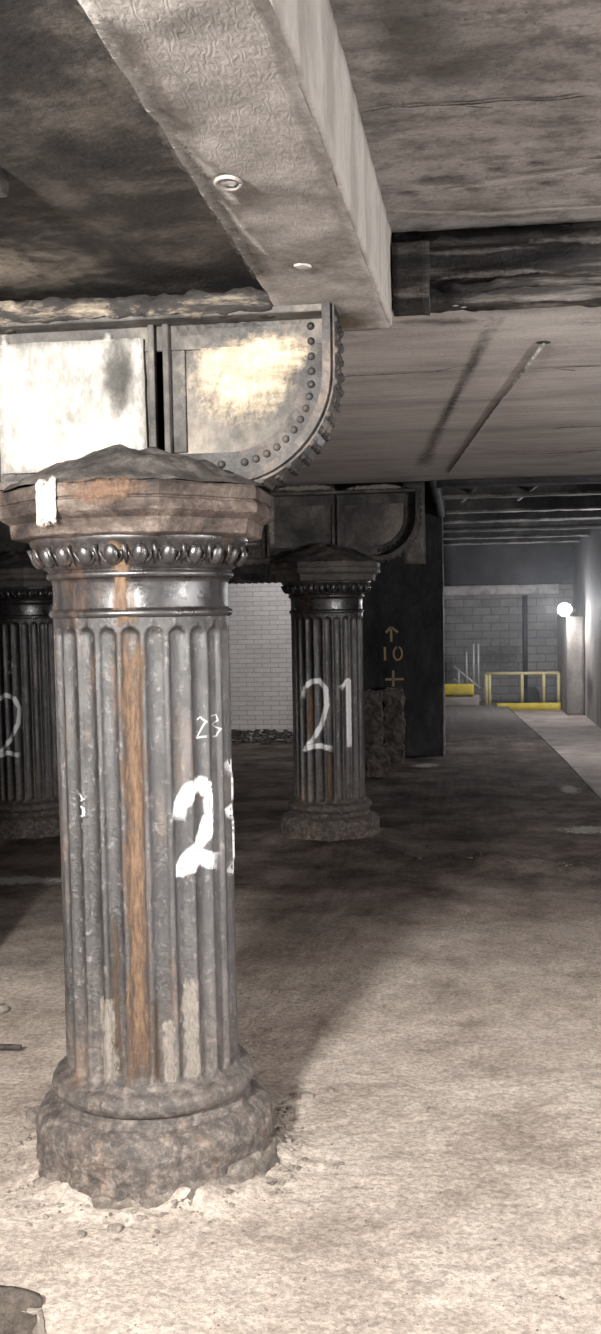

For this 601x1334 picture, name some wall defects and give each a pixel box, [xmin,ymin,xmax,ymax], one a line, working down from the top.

rust [109,541,161,1079]
spalling [27,1308,46,1334]